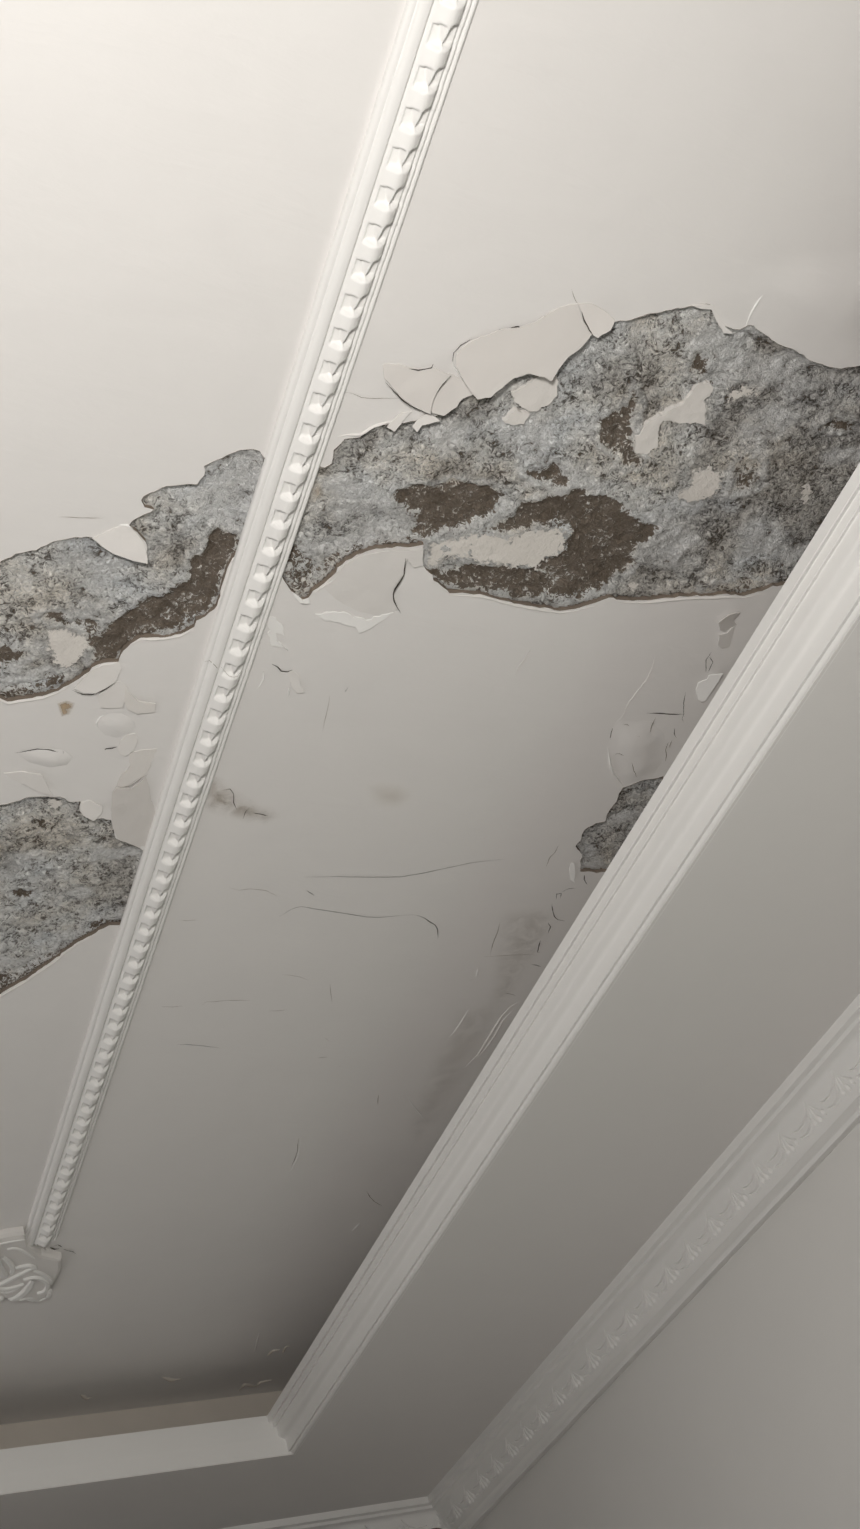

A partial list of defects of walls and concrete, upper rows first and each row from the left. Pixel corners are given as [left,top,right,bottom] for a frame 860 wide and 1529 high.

spalling [0,449,265,728]
spalling [282,291,860,648]
spalling [0,748,157,998]
spalling [569,776,663,883]